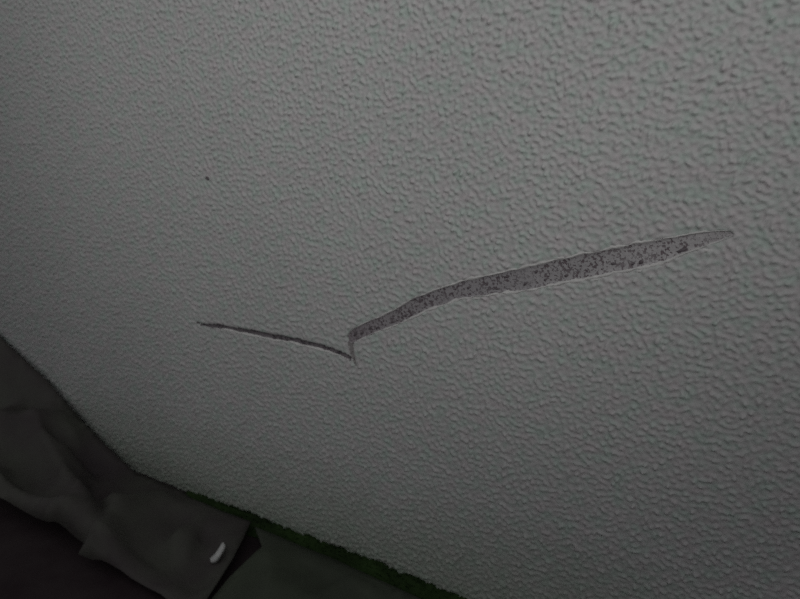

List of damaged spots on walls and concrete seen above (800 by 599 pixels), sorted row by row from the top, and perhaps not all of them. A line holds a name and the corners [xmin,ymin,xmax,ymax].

crack [196,322,357,366]